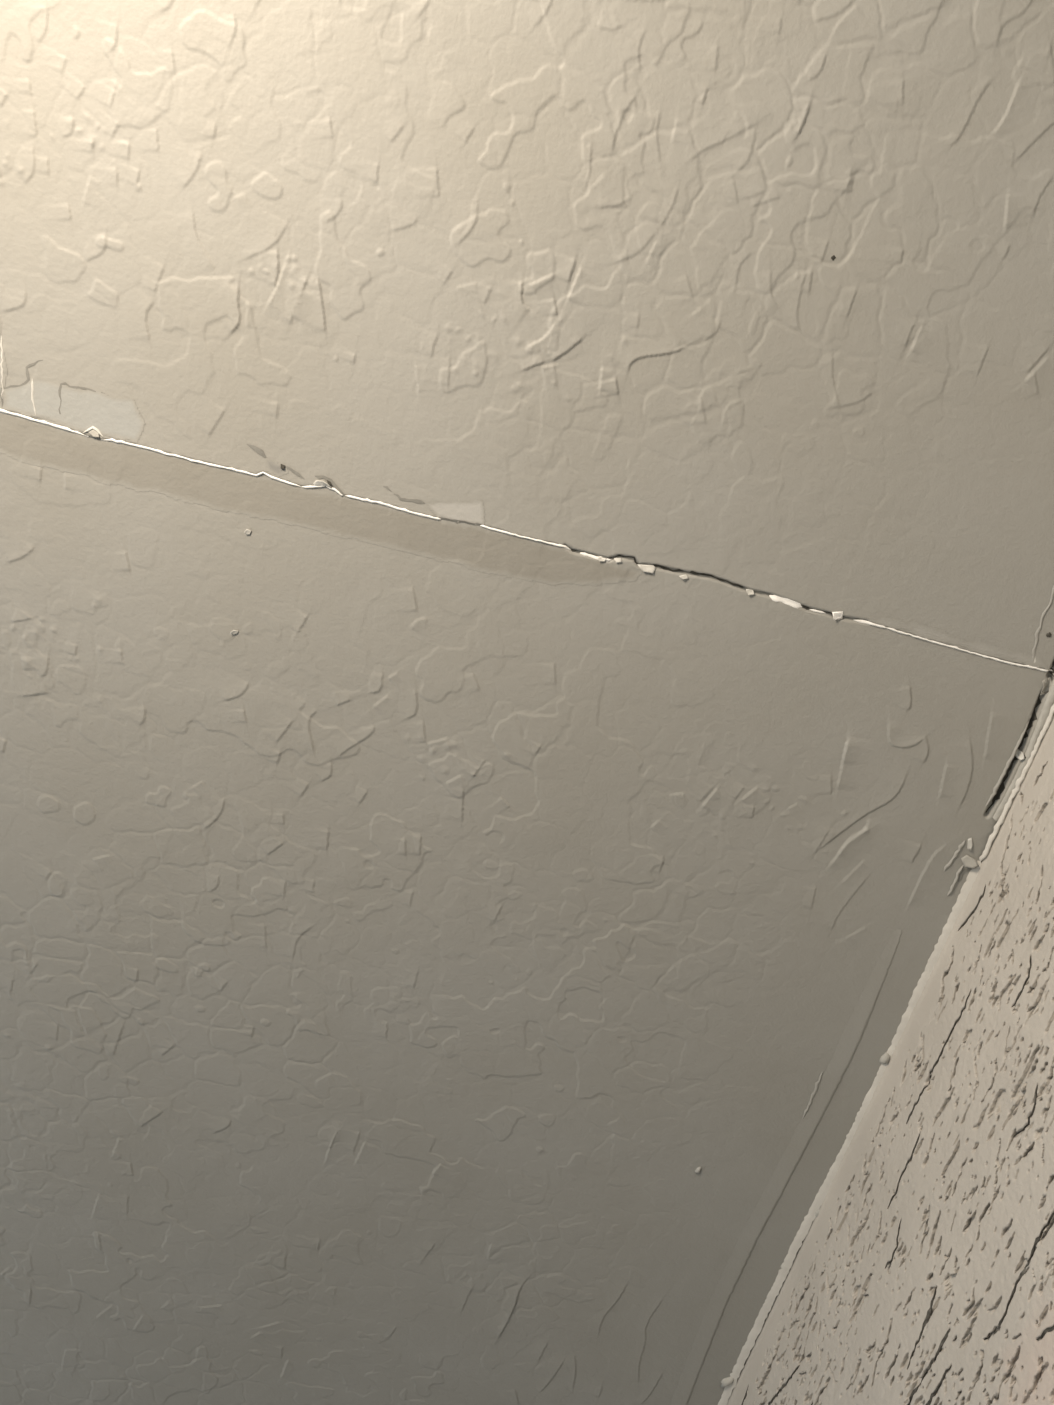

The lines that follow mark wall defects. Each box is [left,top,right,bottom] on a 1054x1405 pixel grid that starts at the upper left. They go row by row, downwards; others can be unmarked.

crack [0,335,1054,822]